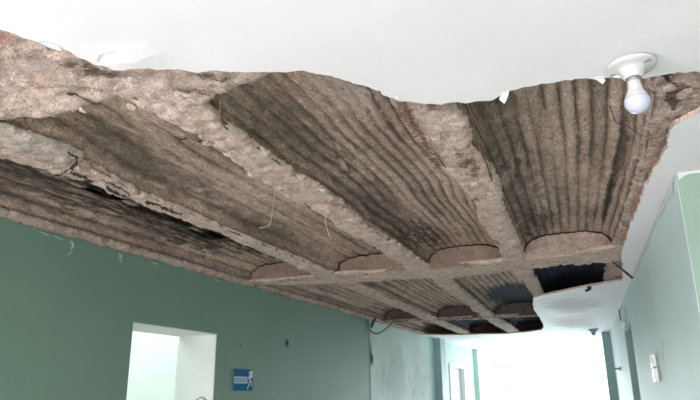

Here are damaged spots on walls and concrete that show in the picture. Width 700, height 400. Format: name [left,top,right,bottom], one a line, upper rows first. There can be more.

spalling [60,62,125,78]
spalling [661,83,693,111]
rust [396,103,444,169]
rust [456,153,480,178]
spalling [477,144,493,182]
peeling [612,170,700,279]